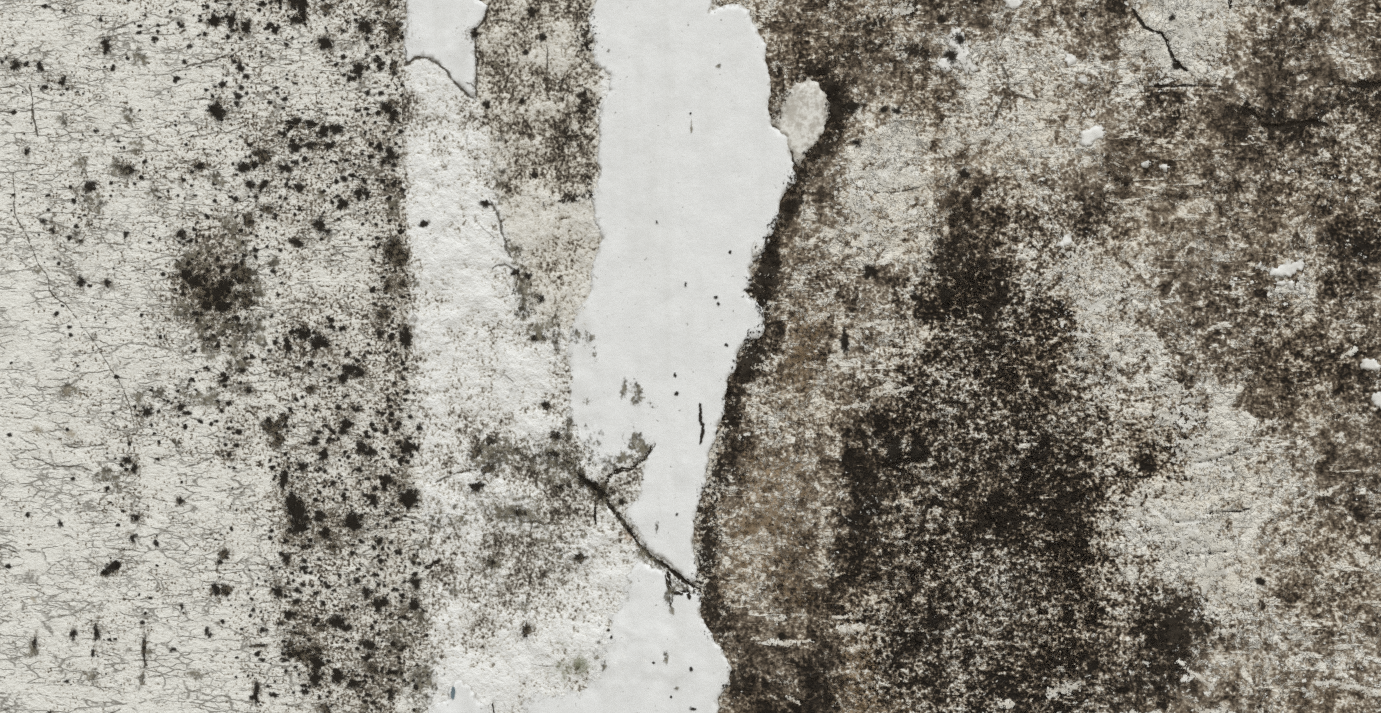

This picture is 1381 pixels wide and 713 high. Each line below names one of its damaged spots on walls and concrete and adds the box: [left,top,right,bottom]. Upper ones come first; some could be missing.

water stain [0,44,87,96]
peeling [403,0,488,98]
water stain [1269,0,1321,90]
water stain [1234,75,1381,141]
peeling [512,0,831,713]
crack [575,443,701,604]
water stain [1125,384,1265,713]
water stain [24,631,41,658]
peeling [428,680,490,713]
water stain [1311,678,1381,697]